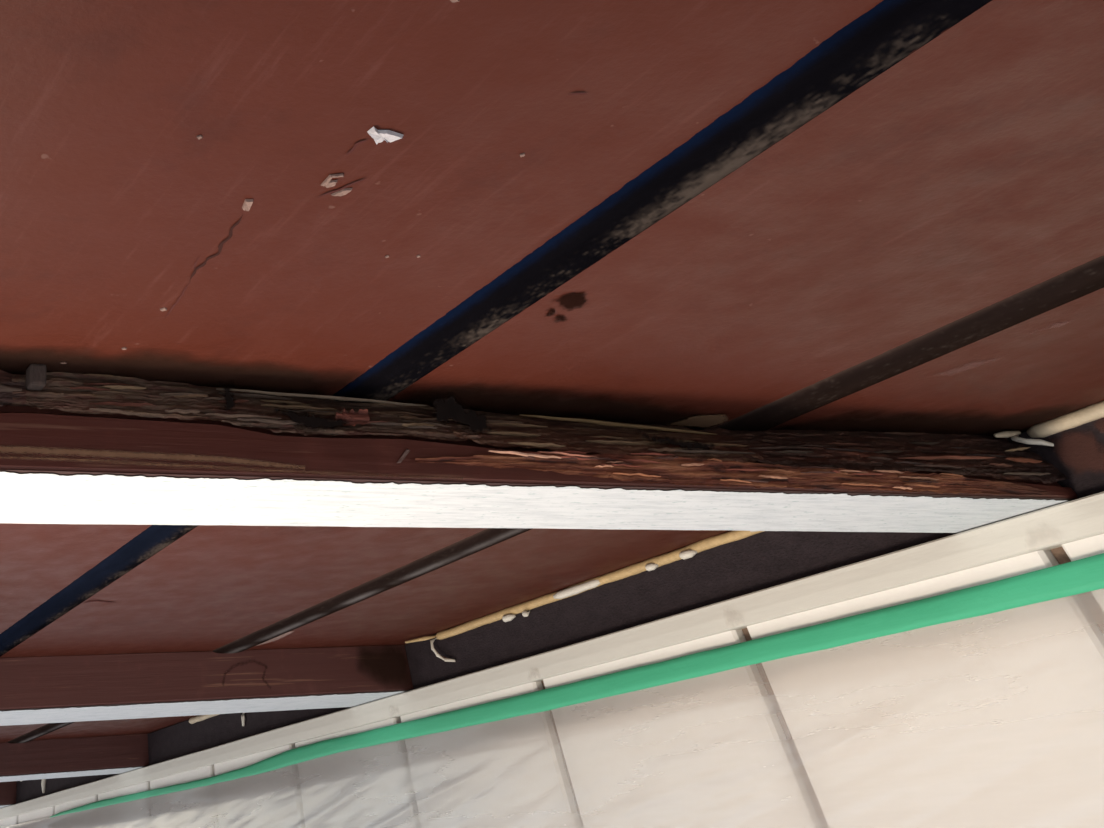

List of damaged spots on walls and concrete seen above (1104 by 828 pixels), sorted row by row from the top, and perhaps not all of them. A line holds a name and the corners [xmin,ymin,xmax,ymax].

peeling [367,126,403,144]
peeling [321,173,353,196]
crack [164,215,243,319]
leakage [546,293,586,322]
peeling [0,446,319,473]
peeling [415,450,1049,495]